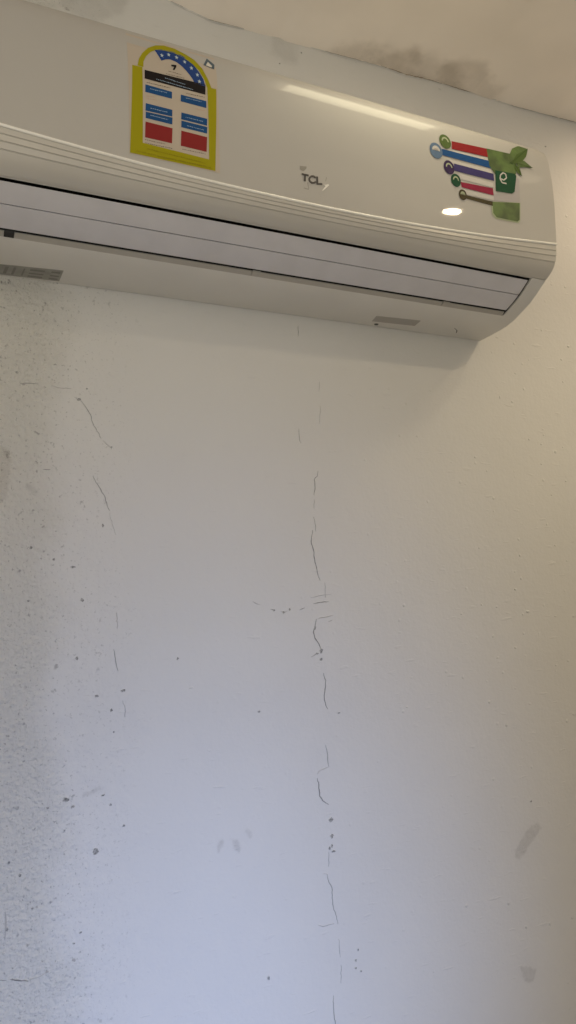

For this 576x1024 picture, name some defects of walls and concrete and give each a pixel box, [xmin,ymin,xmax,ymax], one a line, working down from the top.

crack [92,476,116,535]
crack [253,471,333,709]
crack [317,745,342,1024]